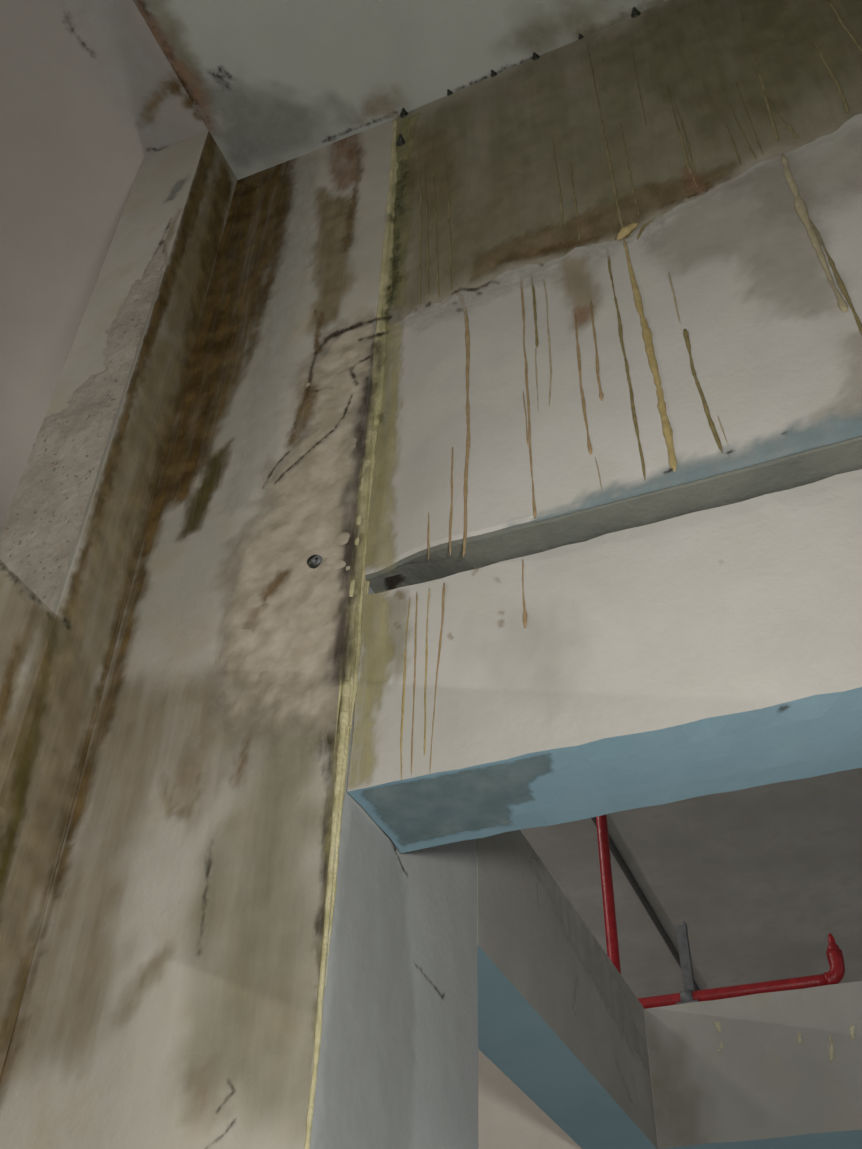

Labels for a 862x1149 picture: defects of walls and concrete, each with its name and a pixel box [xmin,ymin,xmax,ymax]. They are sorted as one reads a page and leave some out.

corrosion [314,134,359,348]
corrosion [471,170,728,280]
crack [263,309,392,487]
damp [354,377,384,486]
damp [0,94,307,988]
damp [333,504,361,680]
damp [327,700,341,772]
damp [316,795,333,935]